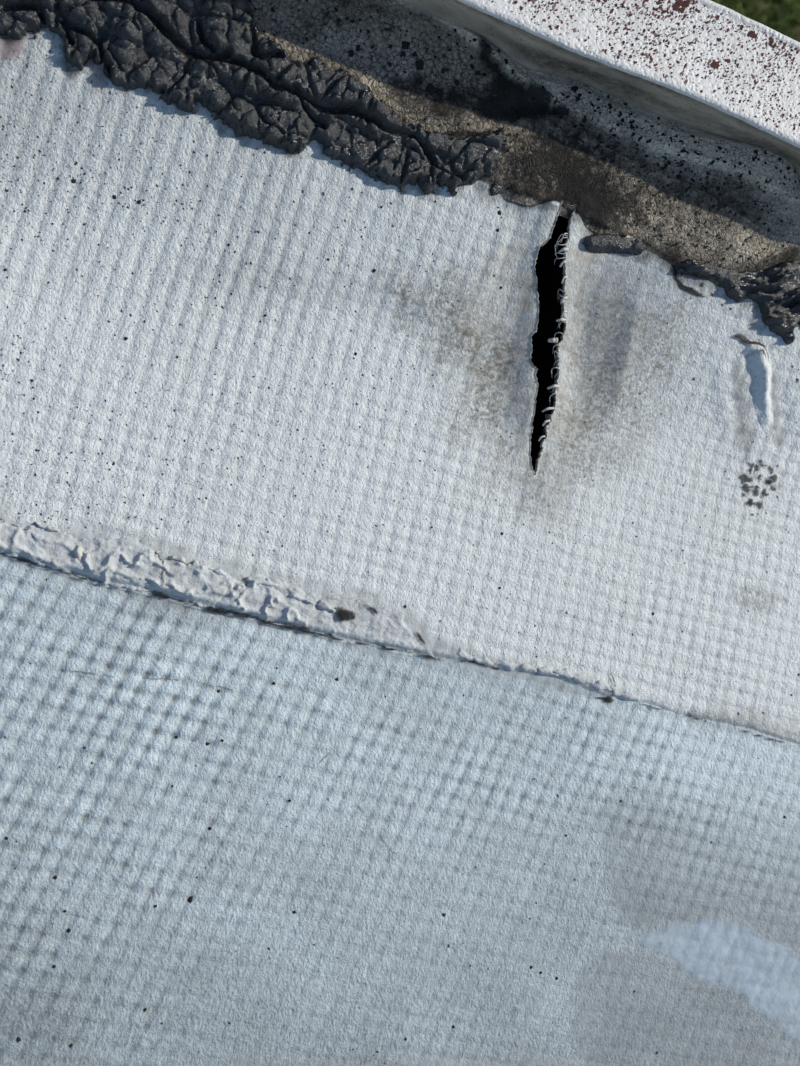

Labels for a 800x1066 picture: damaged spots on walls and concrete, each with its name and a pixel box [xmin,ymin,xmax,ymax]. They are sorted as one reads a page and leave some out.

crack [3,0,110,79]
crack [88,0,223,63]
crack [246,1,505,168]
leakage [645,921,800,1041]